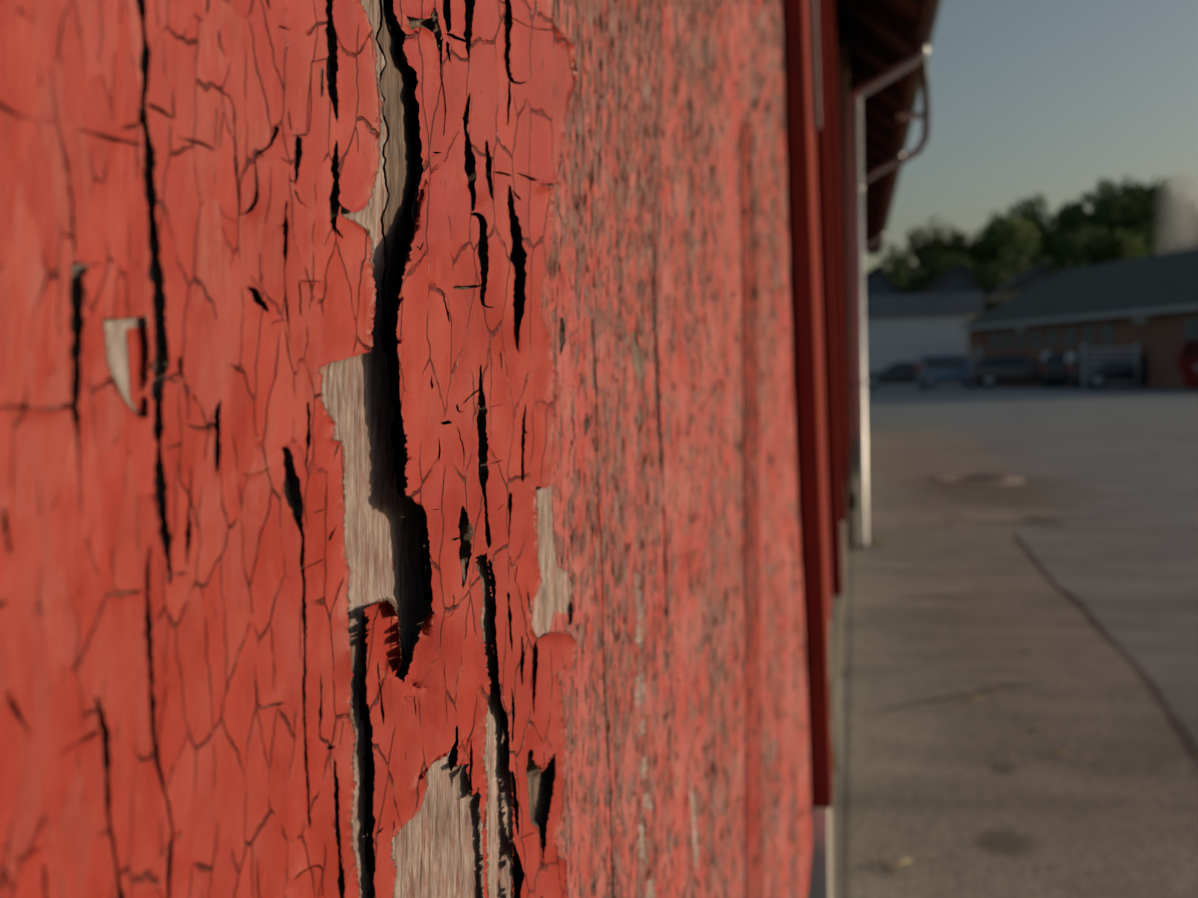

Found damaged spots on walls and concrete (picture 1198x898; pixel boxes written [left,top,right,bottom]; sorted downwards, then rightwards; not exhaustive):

crack [314,0,342,236]
crack [439,0,548,121]
peeling [105,316,153,417]
crack [0,0,312,898]
crack [260,407,345,898]
peeling [320,0,559,898]
crack [434,98,535,581]
crack [508,569,538,740]
peeling [531,485,573,638]
crack [559,319,598,449]
crack [631,203,668,642]
crack [511,771,543,898]